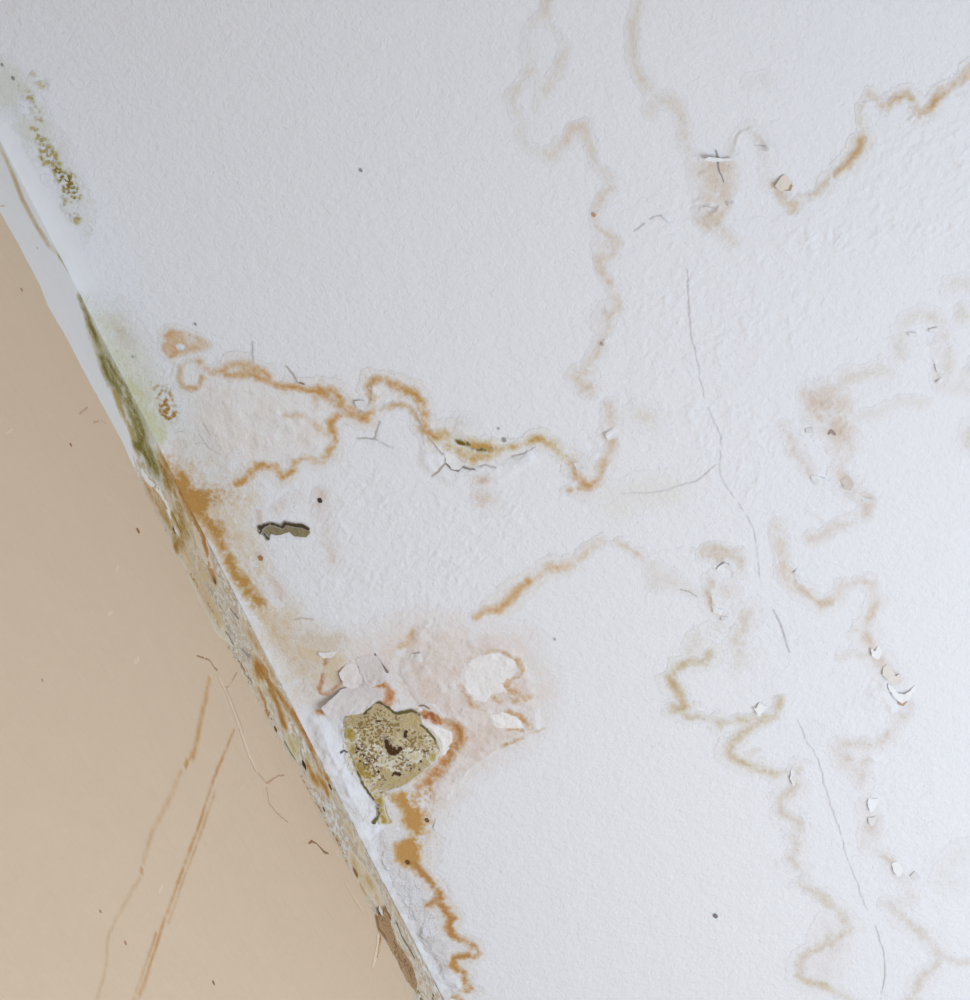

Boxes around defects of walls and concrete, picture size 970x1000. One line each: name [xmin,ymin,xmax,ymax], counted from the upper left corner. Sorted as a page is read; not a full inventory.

water stain [0,142,69,274]
water stain [0,54,96,243]
water stain [623,0,970,251]
spalling [264,526,310,539]
flaking render [190,552,440,1000]